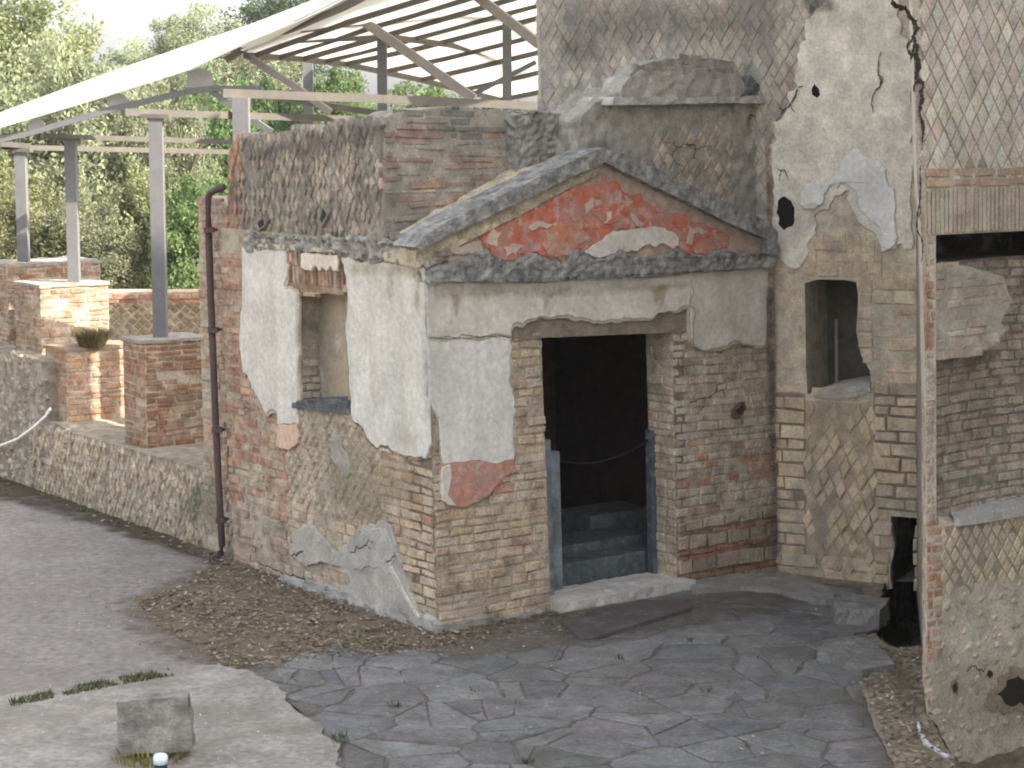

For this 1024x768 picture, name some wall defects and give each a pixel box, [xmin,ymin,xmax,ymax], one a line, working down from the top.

peeling [768,0,915,270]
crack [871,52,883,111]
crack [890,0,925,261]
peeling [528,198,723,258]
peeling [239,216,770,508]
peeling [289,519,422,618]
spalling [984,665,1024,715]